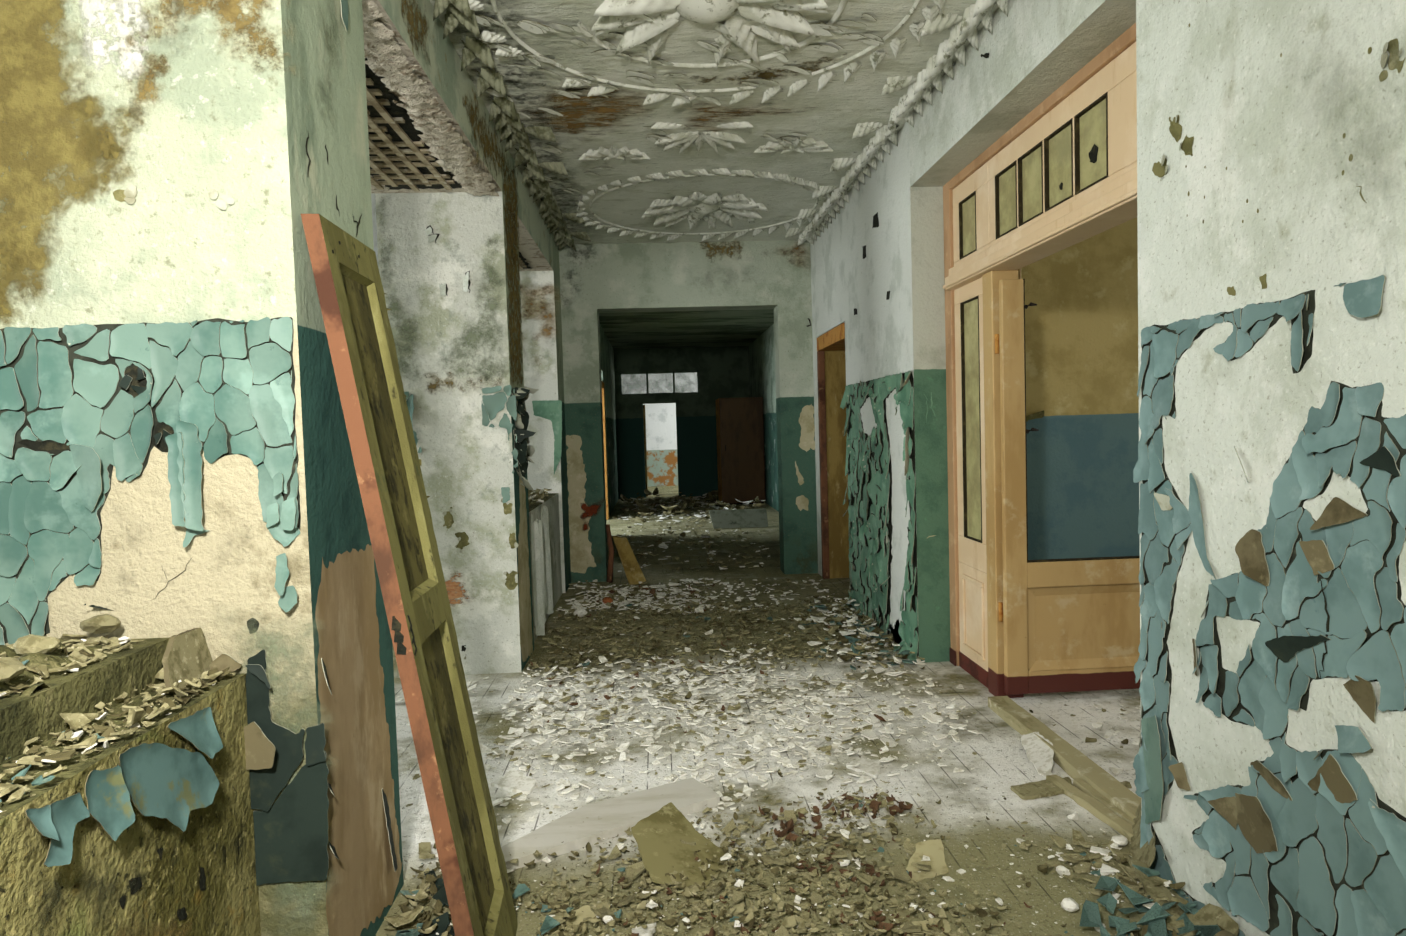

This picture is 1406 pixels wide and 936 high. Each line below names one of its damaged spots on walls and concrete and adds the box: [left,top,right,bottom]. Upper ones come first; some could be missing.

damp [0,0,279,322]
spalling [340,0,499,196]
spalling [1089,144,1098,163]
spalling [1152,115,1206,181]
spalling [1368,38,1406,82]
peeling [25,707,223,867]
peeling [0,317,301,645]
peeling [209,544,402,936]
peeling [480,385,596,662]
peeling [795,405,815,511]
peeling [840,370,919,660]
peeling [1133,269,1406,936]